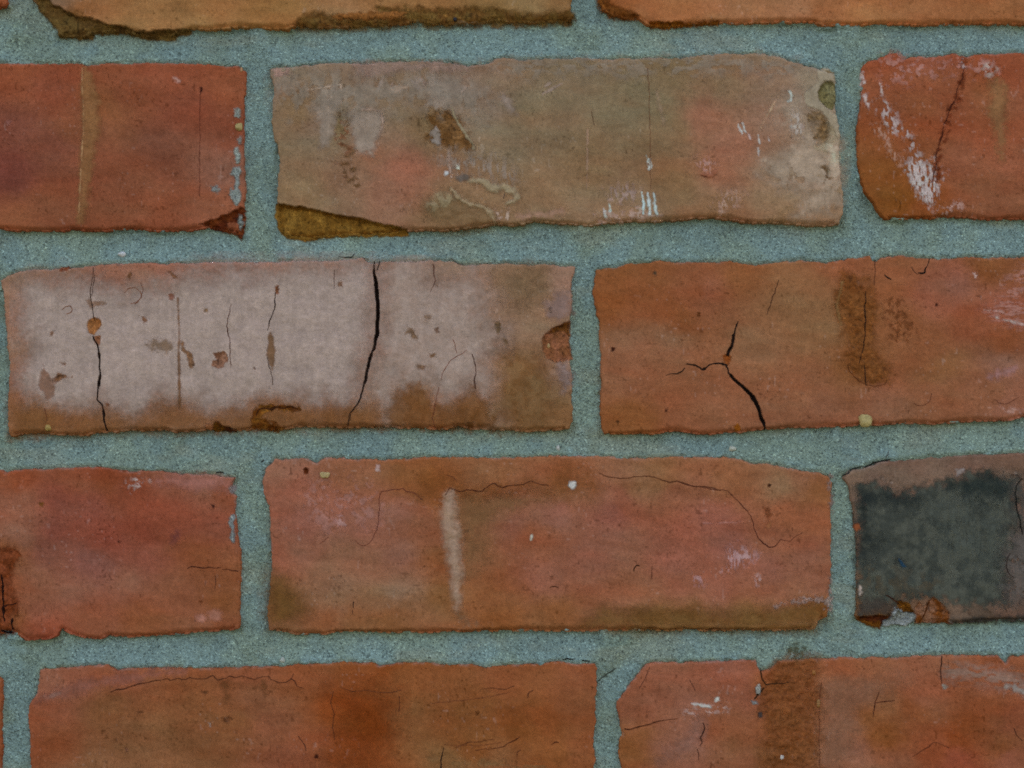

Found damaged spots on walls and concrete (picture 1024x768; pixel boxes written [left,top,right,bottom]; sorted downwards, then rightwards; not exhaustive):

crack [932,56,967,182]
spalling [275,203,408,242]
crack [90,269,108,431]
crack [334,253,380,426]
crack [666,321,766,430]